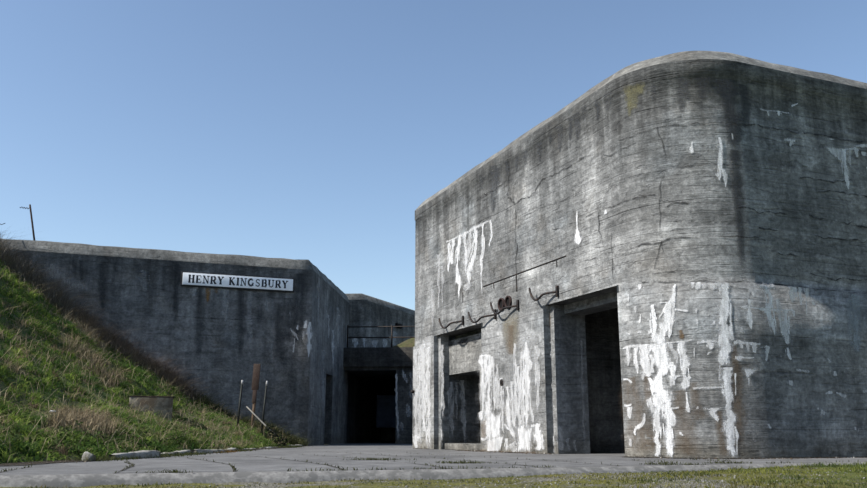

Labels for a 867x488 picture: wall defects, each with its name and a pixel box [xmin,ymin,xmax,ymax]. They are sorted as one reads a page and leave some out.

leakage [828,138,866,188]
leakage [447,150,527,294]
leakage [284,274,312,356]
leakage [414,346,430,448]
leakage [479,342,554,451]
leakage [623,284,697,457]